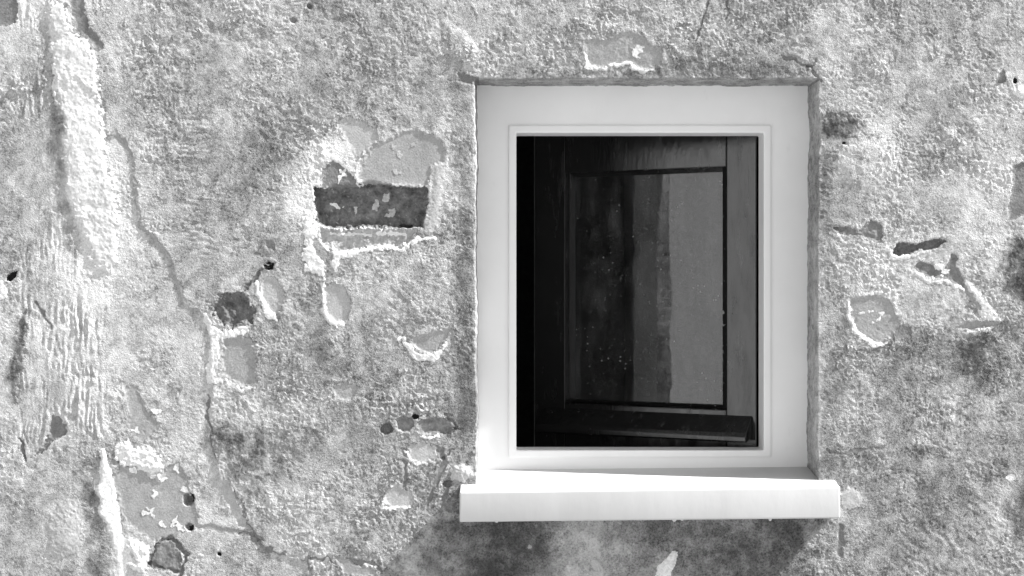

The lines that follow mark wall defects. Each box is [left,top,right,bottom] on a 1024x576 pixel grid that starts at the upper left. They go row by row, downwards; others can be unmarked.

peeling [583,31,662,75]
flaking render [305,117,446,270]
spalling [203,276,286,393]
crack [240,266,270,295]
spalling [320,281,350,328]
spalling [397,329,451,362]
spalling [846,295,912,354]
spalling [829,220,965,291]
spalling [958,321,1000,336]
crack [205,394,219,465]
flaking render [380,414,453,466]
peeling [111,461,199,542]